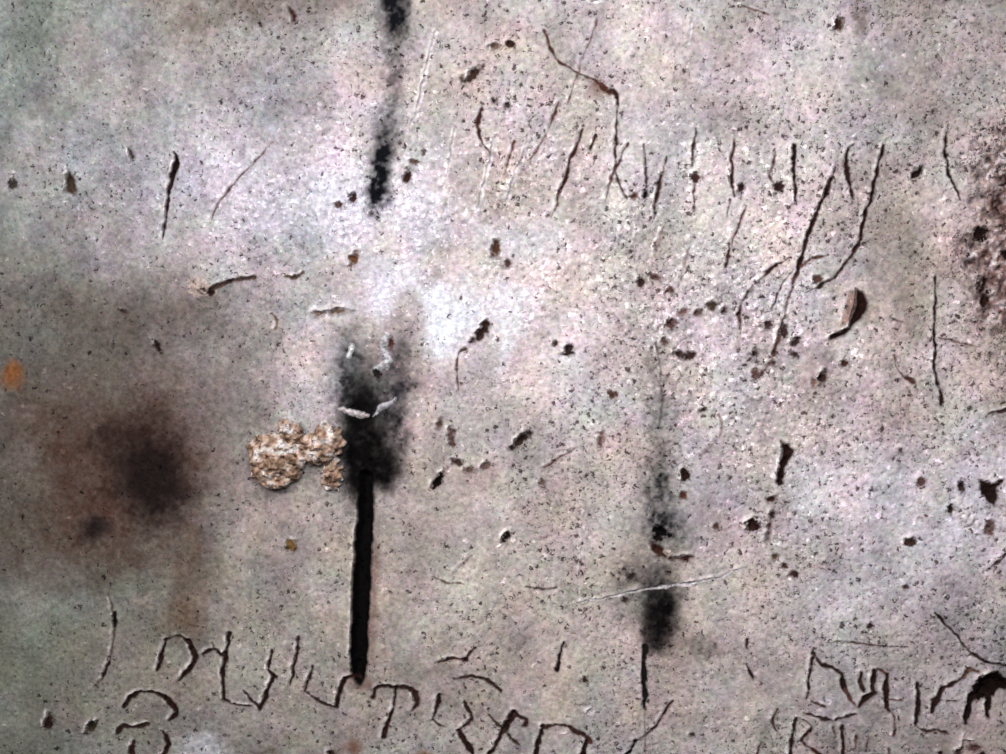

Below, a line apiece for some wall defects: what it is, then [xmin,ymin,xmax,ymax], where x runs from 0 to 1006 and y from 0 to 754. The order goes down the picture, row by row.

spalling [942,115,1006,376]
damp [0,269,279,754]
crack [348,468,376,688]